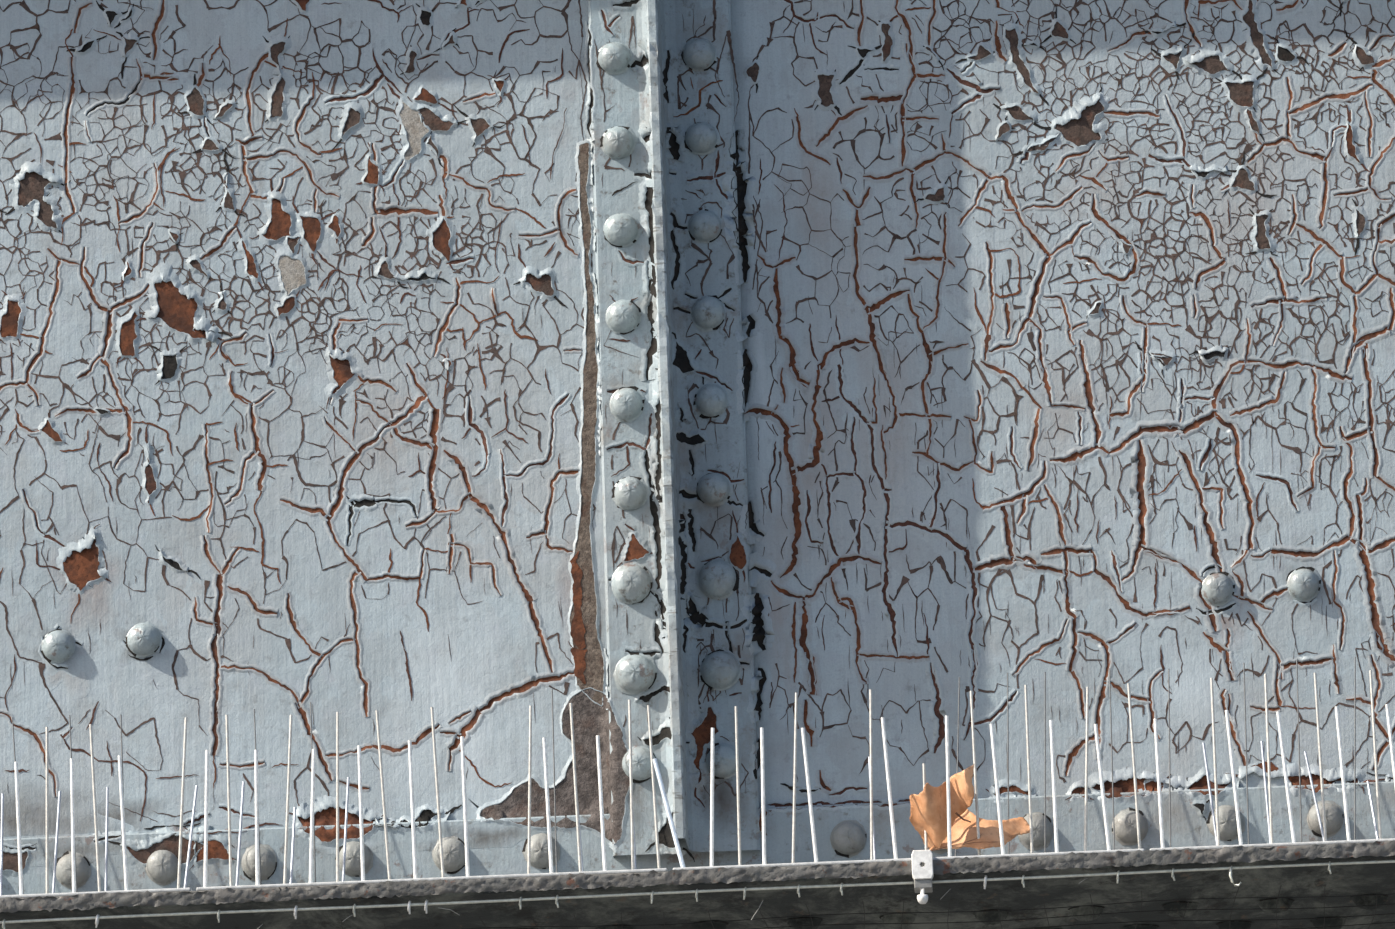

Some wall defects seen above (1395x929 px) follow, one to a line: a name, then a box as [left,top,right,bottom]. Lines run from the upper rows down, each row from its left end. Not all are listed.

peeling [923,7,1110,155]
peeling [177,74,345,319]
peeling [113,226,232,385]
peeling [56,524,111,595]
crack [0,0,649,834]
peeling [289,137,726,851]
corrosion [554,497,579,661]
crack [602,0,1395,813]
crack [0,843,36,853]
crack [93,831,122,845]
peeling [645,805,695,862]